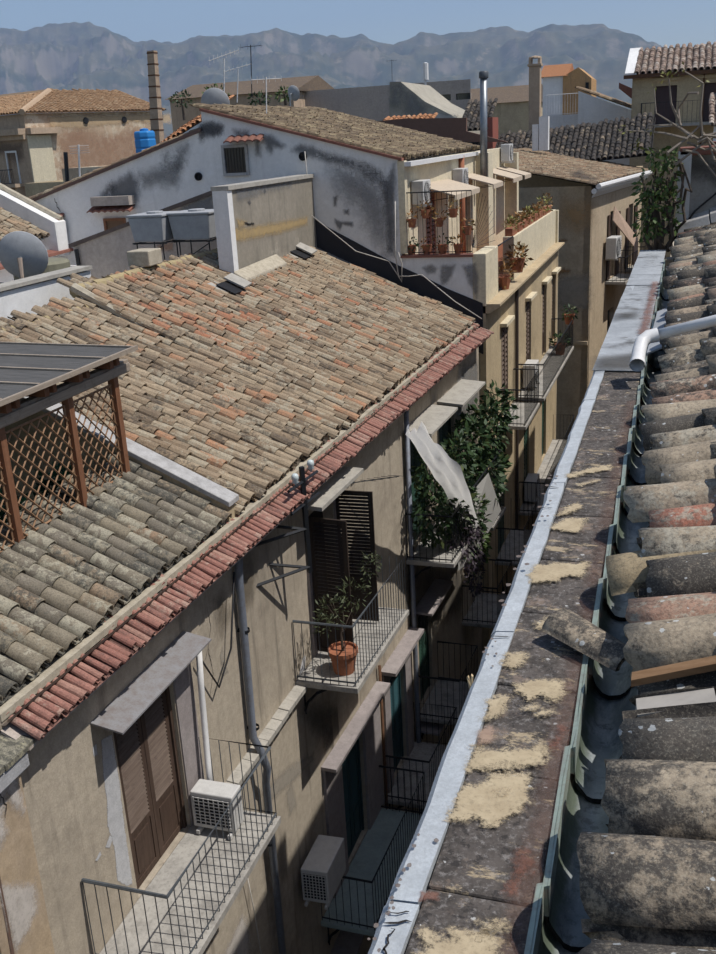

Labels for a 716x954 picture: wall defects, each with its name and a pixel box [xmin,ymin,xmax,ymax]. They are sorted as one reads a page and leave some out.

water stain [200,124,222,138]
water stain [256,136,280,152]
water stain [105,148,186,200]
water stain [238,182,291,198]
water stain [296,146,394,252]
water stain [235,218,307,241]
crack [382,911,412,954]